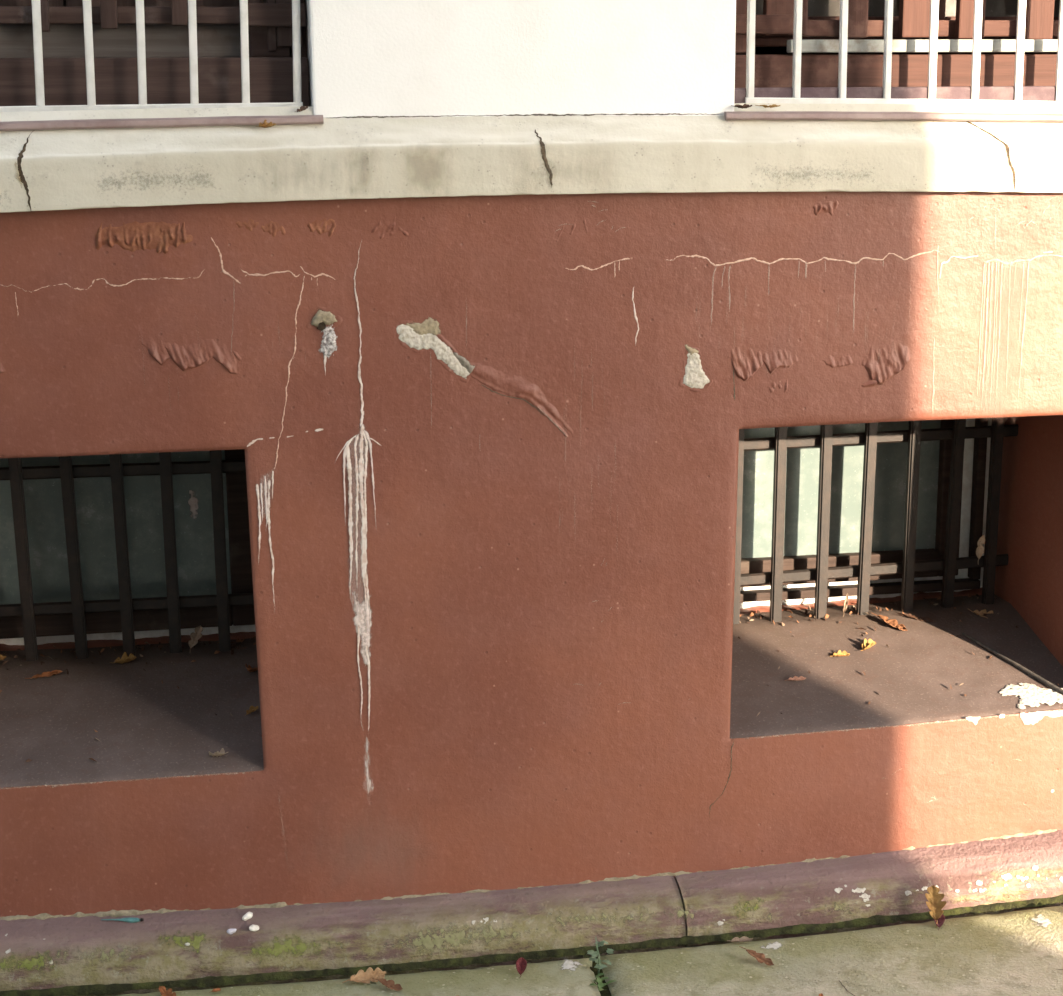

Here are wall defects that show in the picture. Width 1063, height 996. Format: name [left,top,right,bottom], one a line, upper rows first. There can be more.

crack [17,131,33,210]
crack [333,113,719,187]
crack [966,121,1016,191]
crack [2,237,364,469]
crack [670,250,977,331]
water stain [978,259,1031,384]
water stain [335,424,380,792]
peeling [935,683,1063,725]